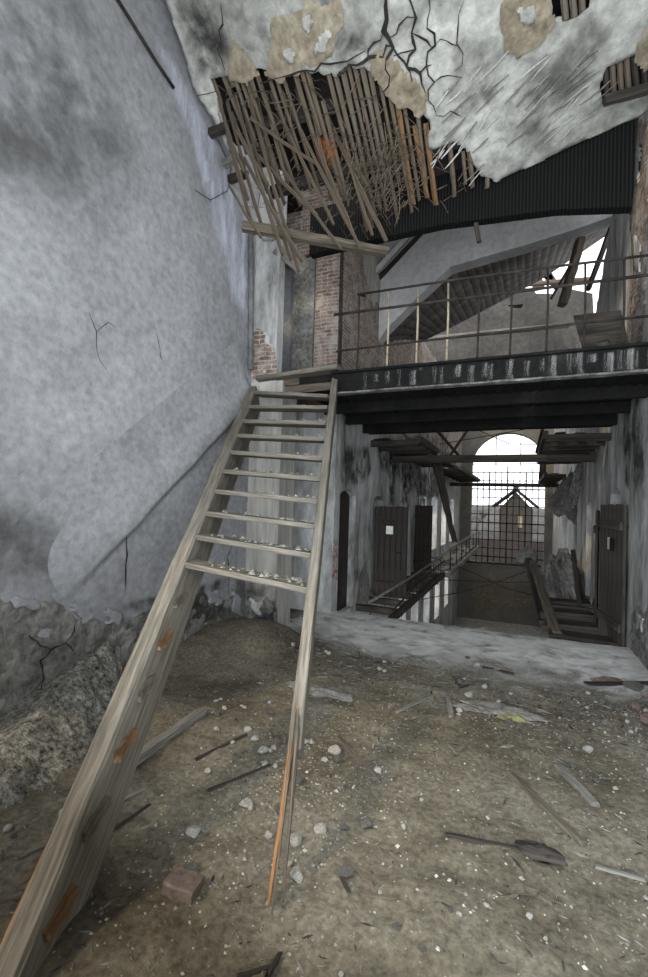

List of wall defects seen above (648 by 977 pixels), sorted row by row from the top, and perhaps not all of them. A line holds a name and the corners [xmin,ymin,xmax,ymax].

flaking render [225,0,344,87]
crack [260,0,464,117]
flaking render [370,50,428,118]
flaking render [499,0,555,59]
flaking render [634,26,648,72]
damp [343,437,447,507]
damp [623,399,645,484]
flaking render [0,595,150,716]
flaking render [179,587,278,645]
flaking render [630,605,648,667]